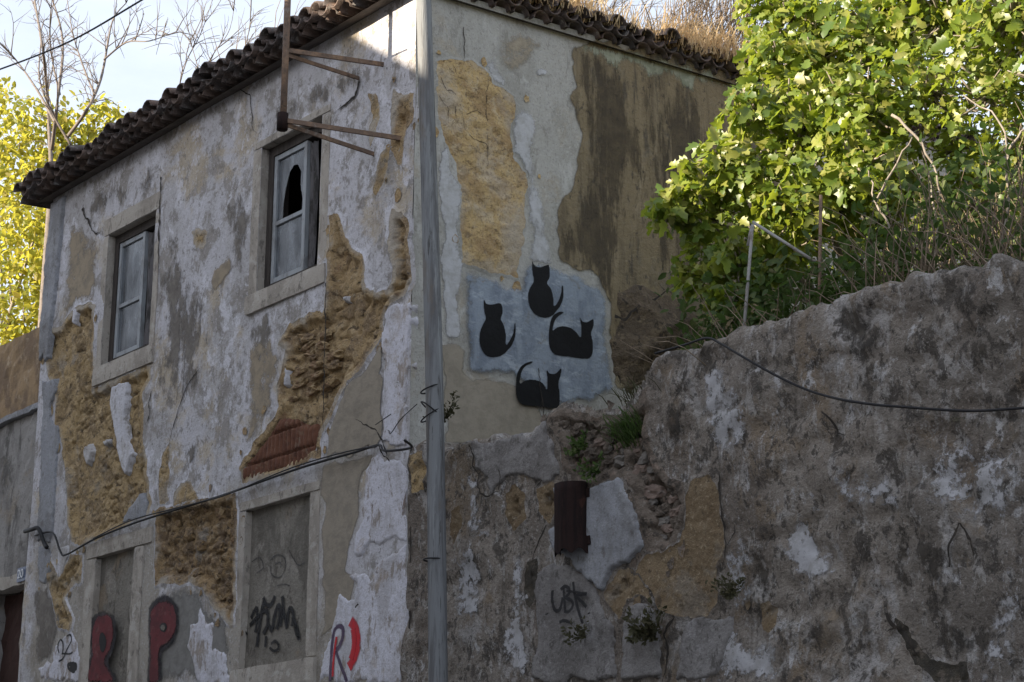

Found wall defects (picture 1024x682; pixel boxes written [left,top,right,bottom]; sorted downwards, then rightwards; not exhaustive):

spalling [433,50,551,338]
damp [557,40,767,351]
spalling [37,77,427,682]
spalling [503,370,730,624]